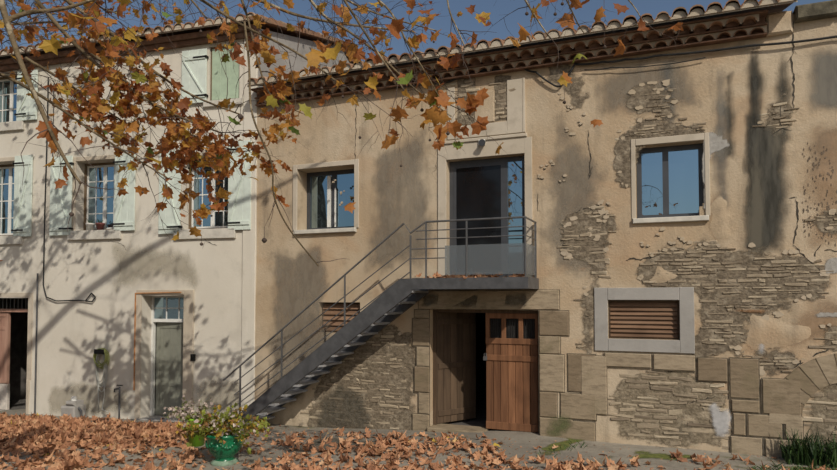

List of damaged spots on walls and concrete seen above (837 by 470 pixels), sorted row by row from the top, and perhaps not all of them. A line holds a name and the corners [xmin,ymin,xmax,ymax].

peeling [613,79,707,188]
leakage [746,63,787,250]
leakage [778,66,789,105]
peeling [557,199,623,354]
peeling [635,236,837,376]